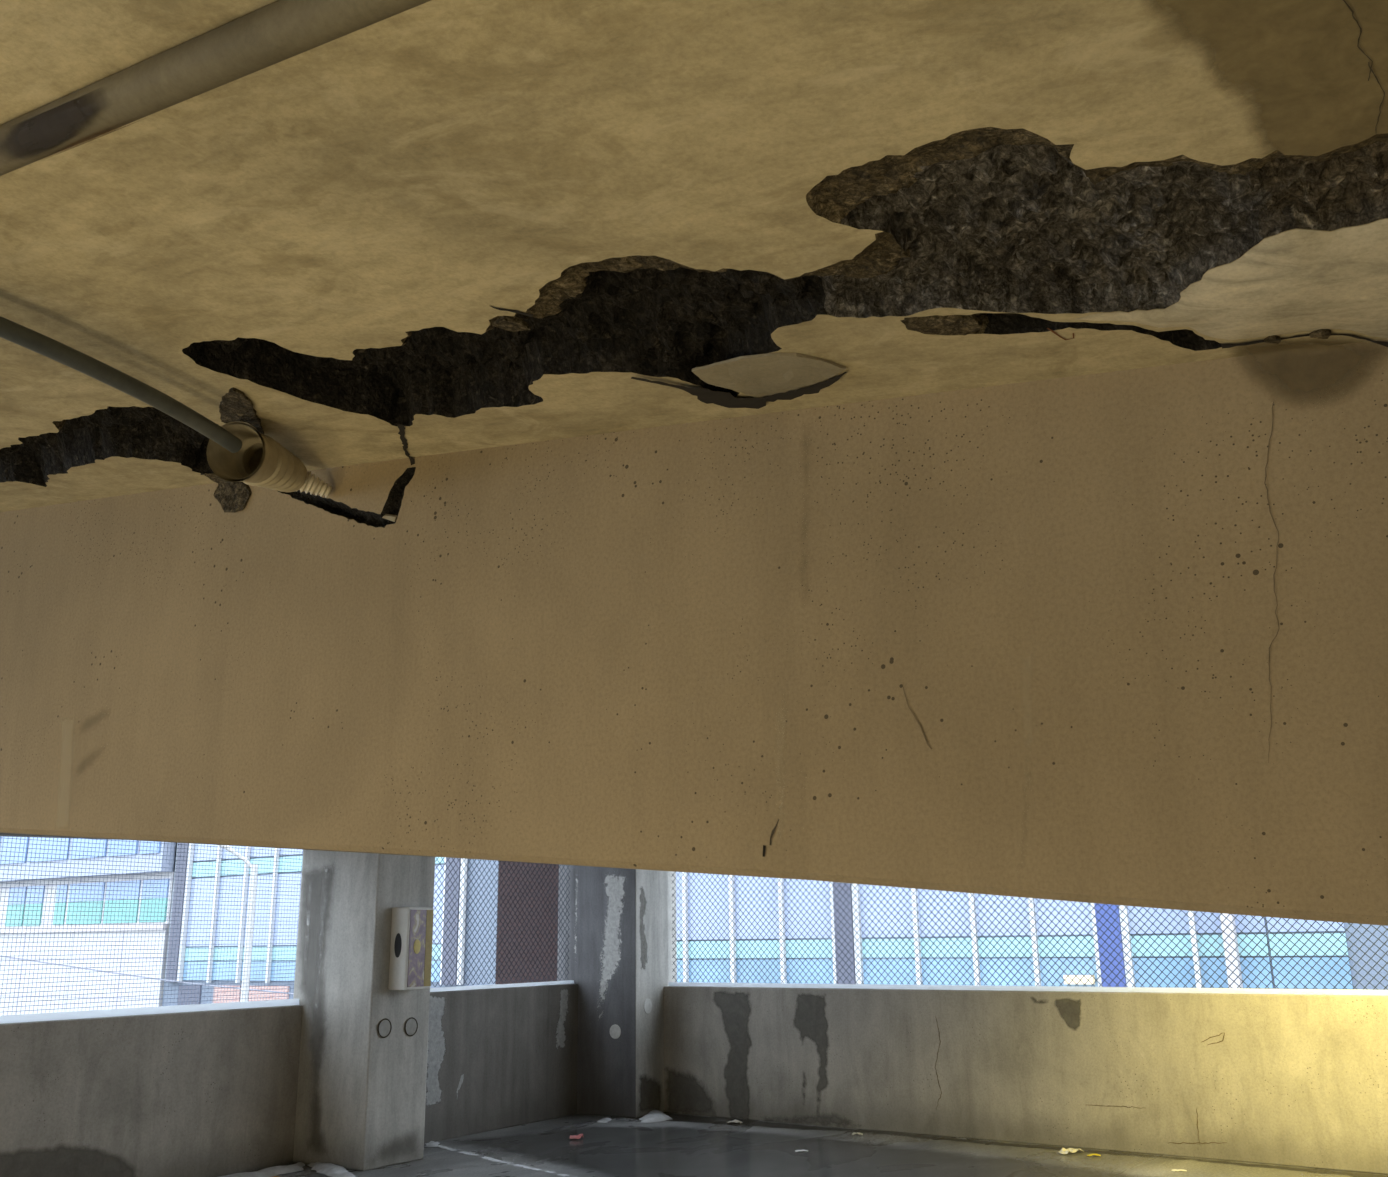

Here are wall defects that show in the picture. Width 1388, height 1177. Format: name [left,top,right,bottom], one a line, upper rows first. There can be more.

leakage [1151,0,1388,156]
crack [1343,0,1385,131]
spalling [182,127,1388,465]
leakage [1240,342,1378,398]
spalling [0,406,251,513]
crack [278,467,416,528]
crack [1264,402,1279,763]
leakage [597,875,647,1017]
leakage [637,992,1388,1177]
leakage [0,1146,134,1177]